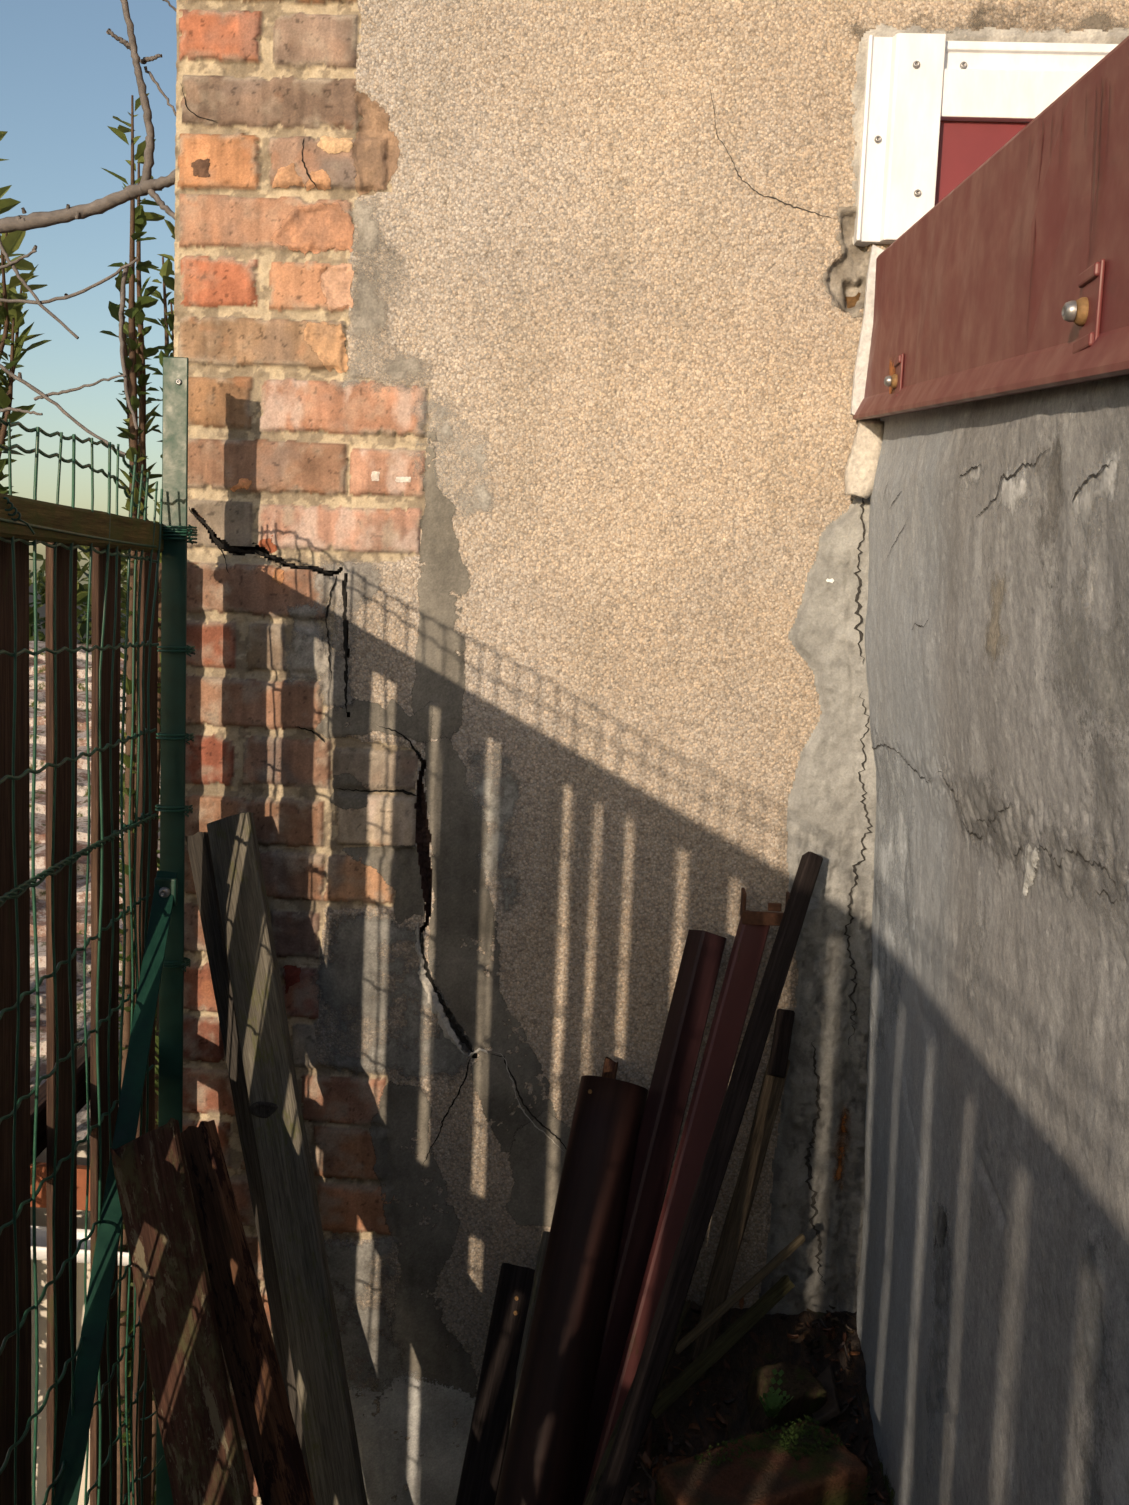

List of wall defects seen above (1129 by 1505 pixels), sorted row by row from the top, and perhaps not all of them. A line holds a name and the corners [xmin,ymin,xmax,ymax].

spalling [191,158,210,177]
crack [710,90,836,219]
spalling [271,92,402,373]
spalling [822,206,871,318]
peeling [844,420,884,499]
crack [959,450,1047,517]
crack [1072,460,1113,501]
spalling [259,535,284,585]
crack [189,508,567,1169]